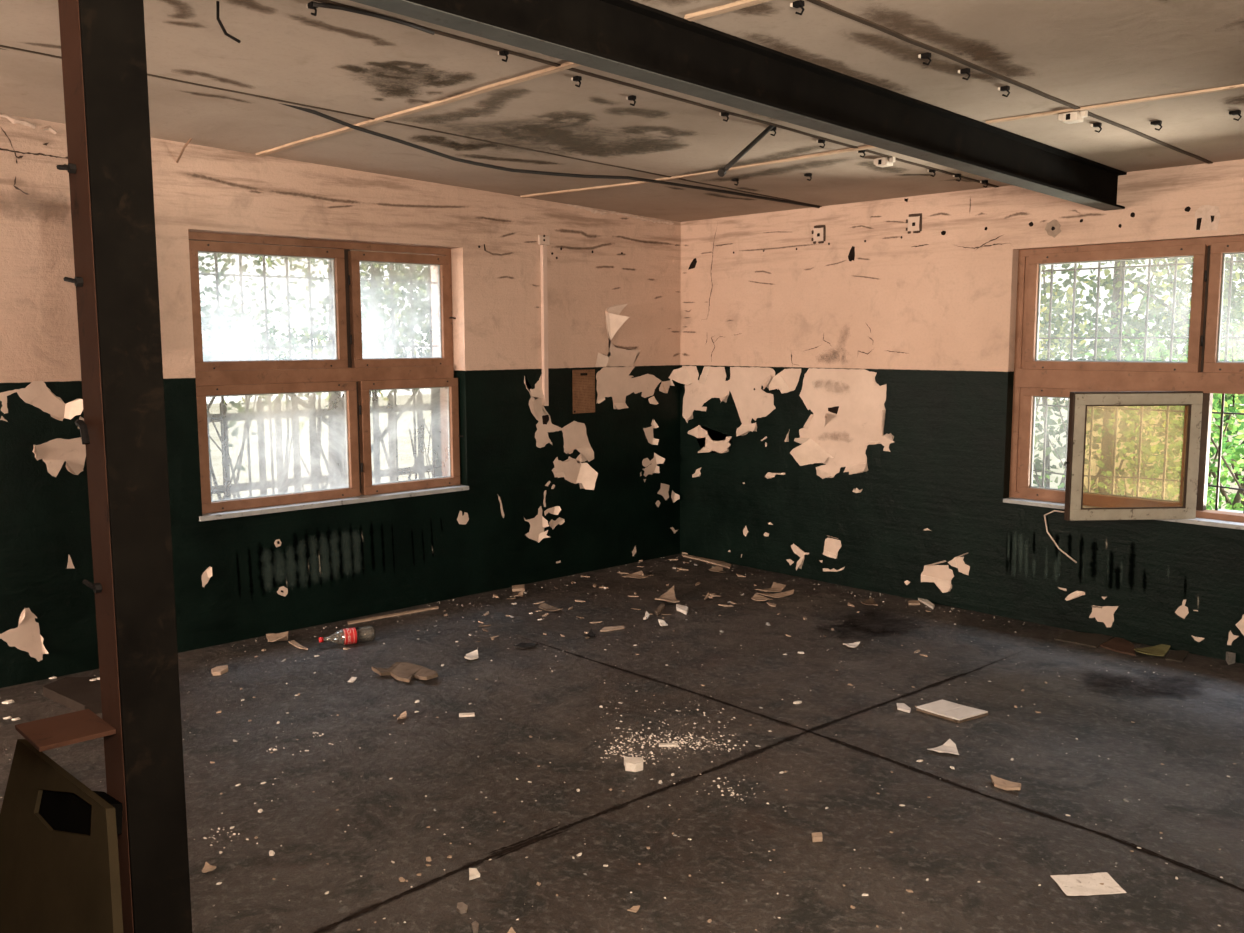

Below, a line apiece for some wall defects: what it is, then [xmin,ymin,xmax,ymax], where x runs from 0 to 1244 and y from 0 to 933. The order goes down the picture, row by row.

leakage [233,0,273,12]
leakage [295,17,389,45]
leakage [341,61,691,164]
peeling [0,381,86,477]
peeling [595,353,894,493]
peeling [524,376,598,543]
peeling [640,420,680,507]
peeling [787,536,845,572]
peeling [904,552,970,593]
peeling [0,608,48,662]
peeling [1058,587,1118,627]
peeling [1227,614,1244,645]